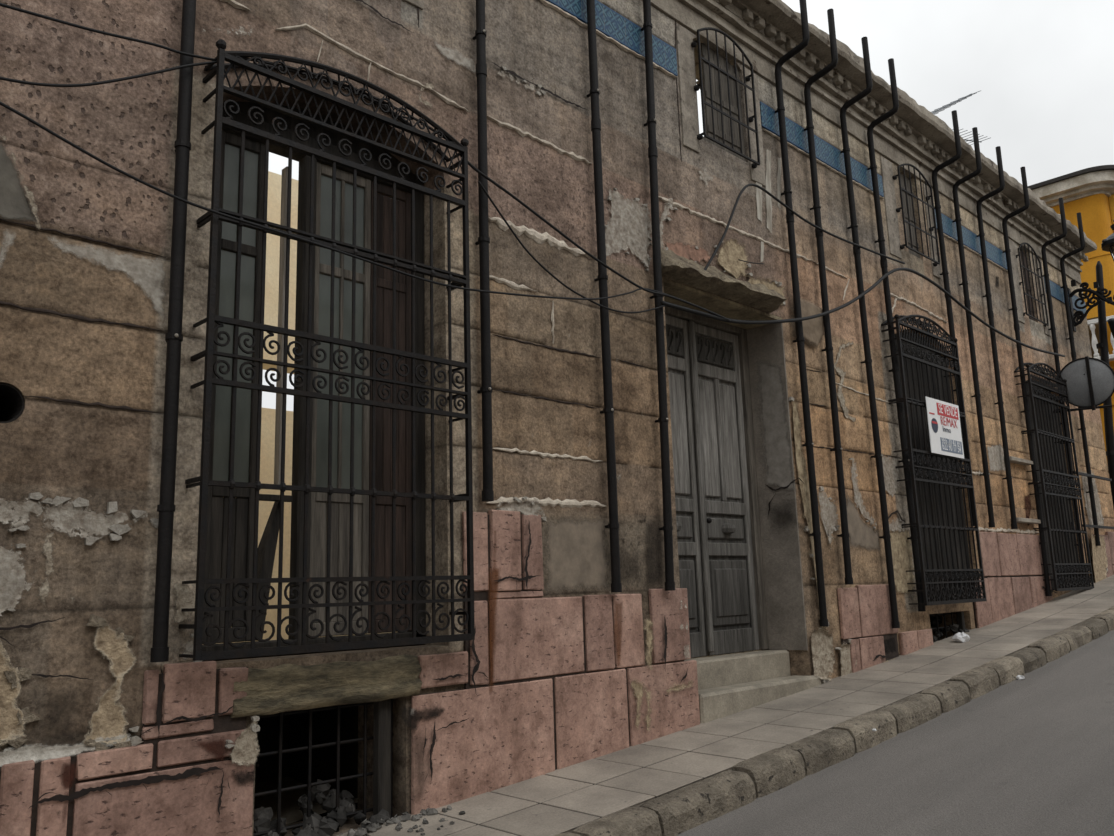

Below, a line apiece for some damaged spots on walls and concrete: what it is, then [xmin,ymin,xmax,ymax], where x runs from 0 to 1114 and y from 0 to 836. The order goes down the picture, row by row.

peeling [605,188,786,306]
peeling [0,492,159,616]
crack [495,518,540,589]
spalling [0,643,41,749]
spalling [82,614,137,751]
crack [28,766,230,815]
spalling [225,716,260,766]
crack [422,626,488,780]